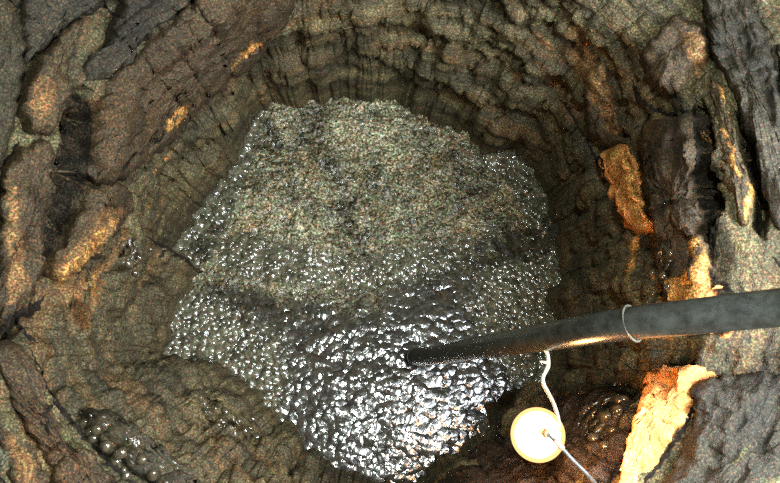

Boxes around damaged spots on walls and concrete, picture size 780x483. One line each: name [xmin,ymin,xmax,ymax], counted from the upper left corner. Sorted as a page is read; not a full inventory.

rust [535,27,648,280]
damp [62,414,179,482]